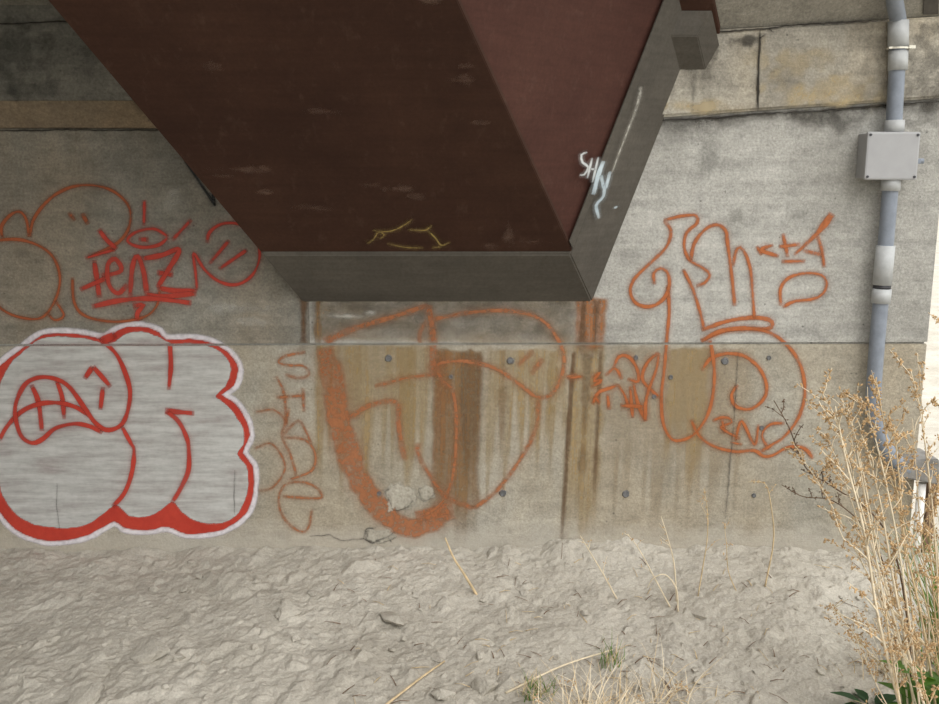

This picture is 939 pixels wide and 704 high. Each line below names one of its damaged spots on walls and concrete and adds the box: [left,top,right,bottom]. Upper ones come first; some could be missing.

rust [433,349,481,514]
rust [562,298,606,519]